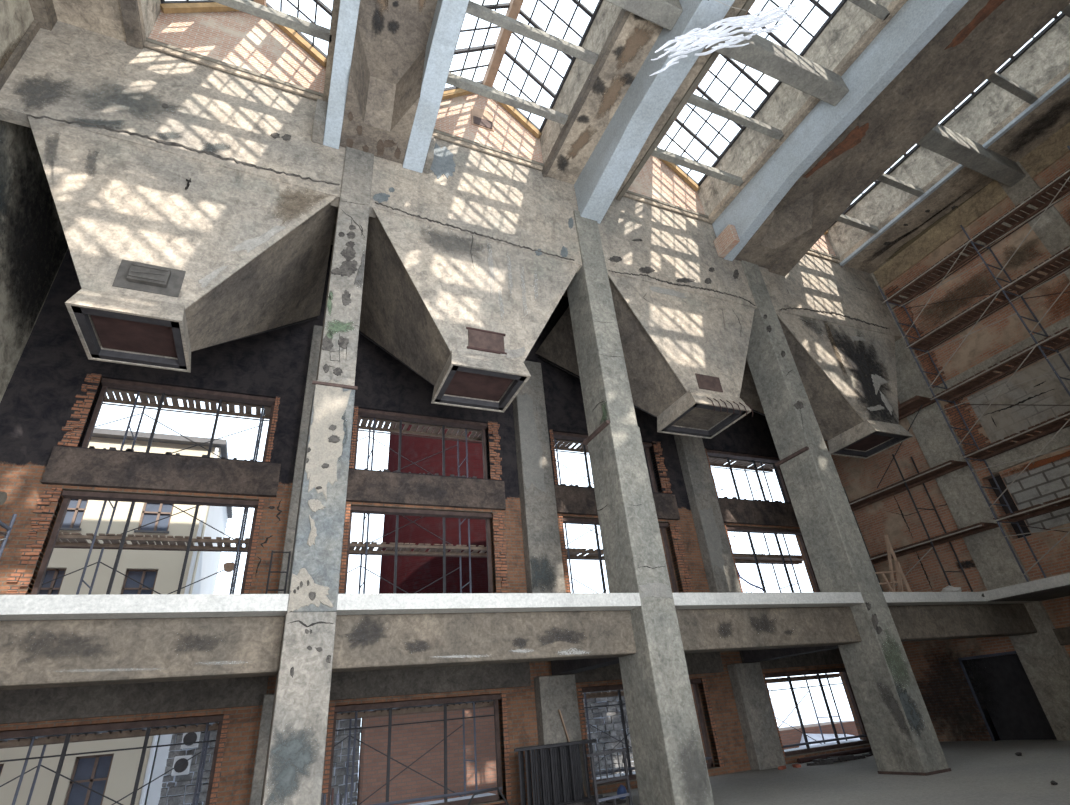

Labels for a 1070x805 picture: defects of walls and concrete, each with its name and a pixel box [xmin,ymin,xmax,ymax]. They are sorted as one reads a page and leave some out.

damp [16,79,64,108]
spalling [330,225,358,277]
spalling [342,290,351,306]
spalling [322,336,349,351]
flaking render [305,364,351,546]
flaking render [287,568,333,614]
damp [350,618,383,645]
damp [407,641,428,652]
damp [545,629,583,655]